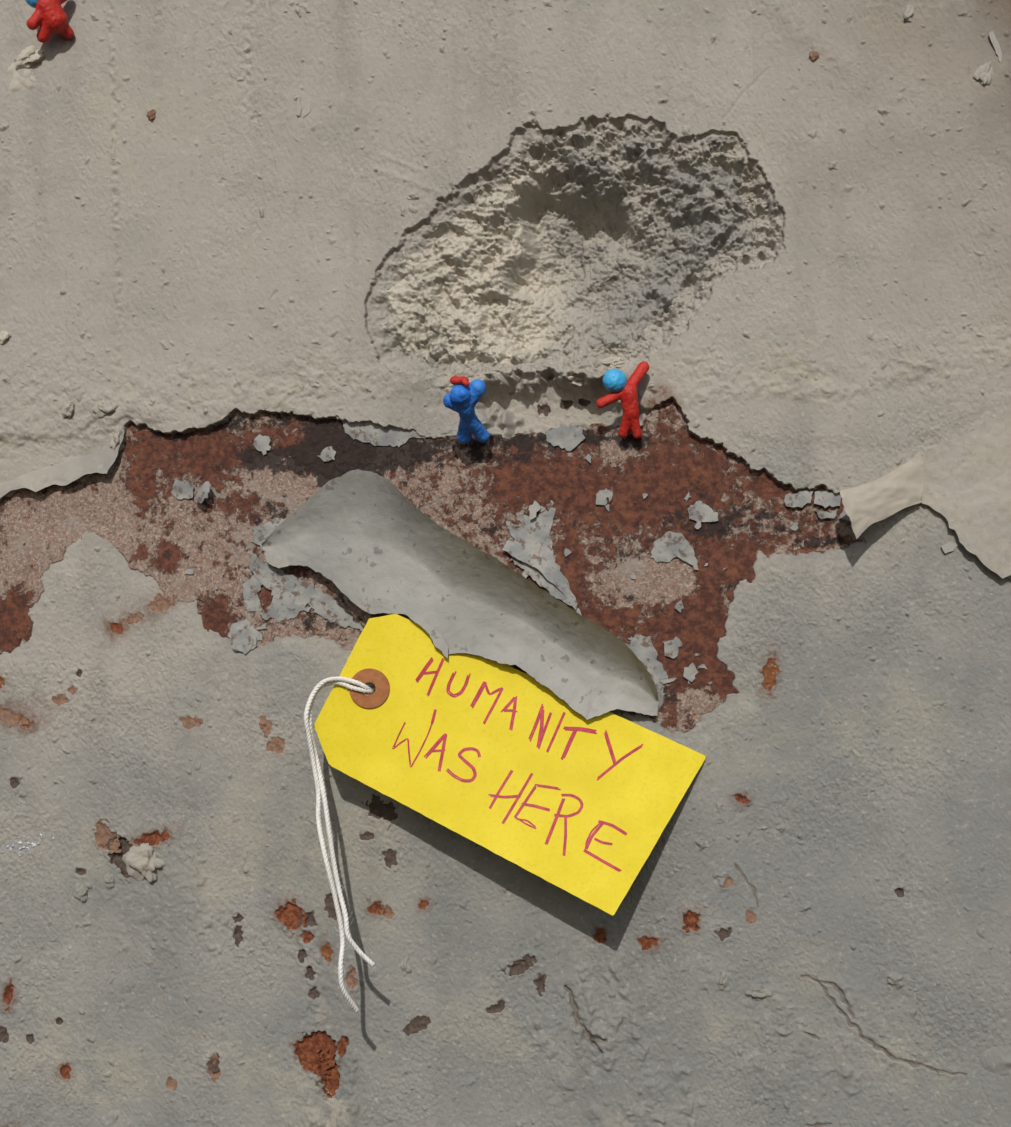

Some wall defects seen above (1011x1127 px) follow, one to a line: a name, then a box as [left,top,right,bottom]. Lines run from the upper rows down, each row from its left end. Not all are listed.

spalling [123,593,175,624]
corrosion [0,400,862,733]
peeling [262,469,659,720]
spalling [179,715,203,729]
spalling [259,716,285,755]
corrosion [129,830,170,849]
corrosion [275,899,333,962]
crack [800,975,967,1076]
corrosion [294,1031,349,1098]